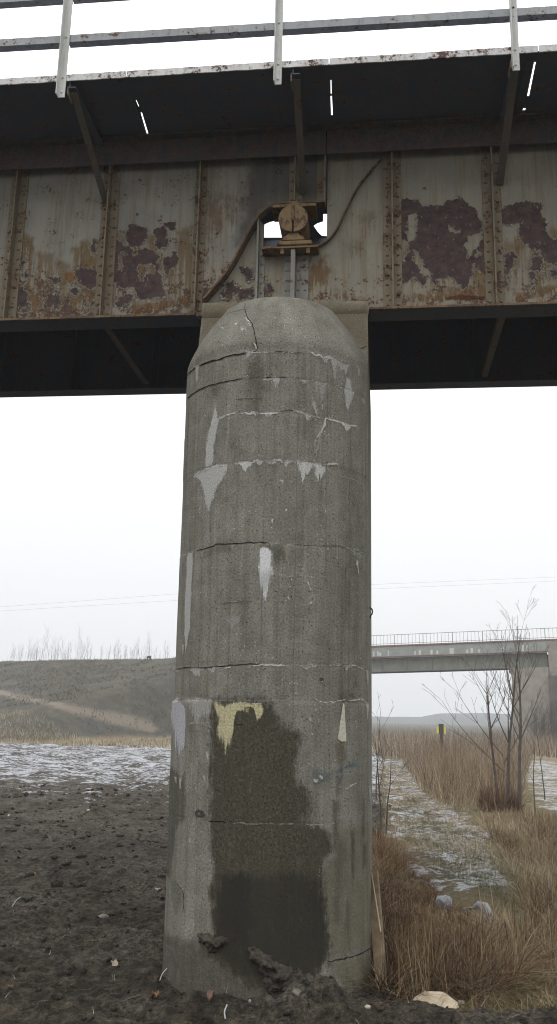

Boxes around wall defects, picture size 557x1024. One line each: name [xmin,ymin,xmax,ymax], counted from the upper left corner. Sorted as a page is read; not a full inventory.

rust [402,286,485,303]
crack [187,303,297,415]
crack [197,542,268,551]
crack [178,662,253,670]
damp [162,697,332,998]